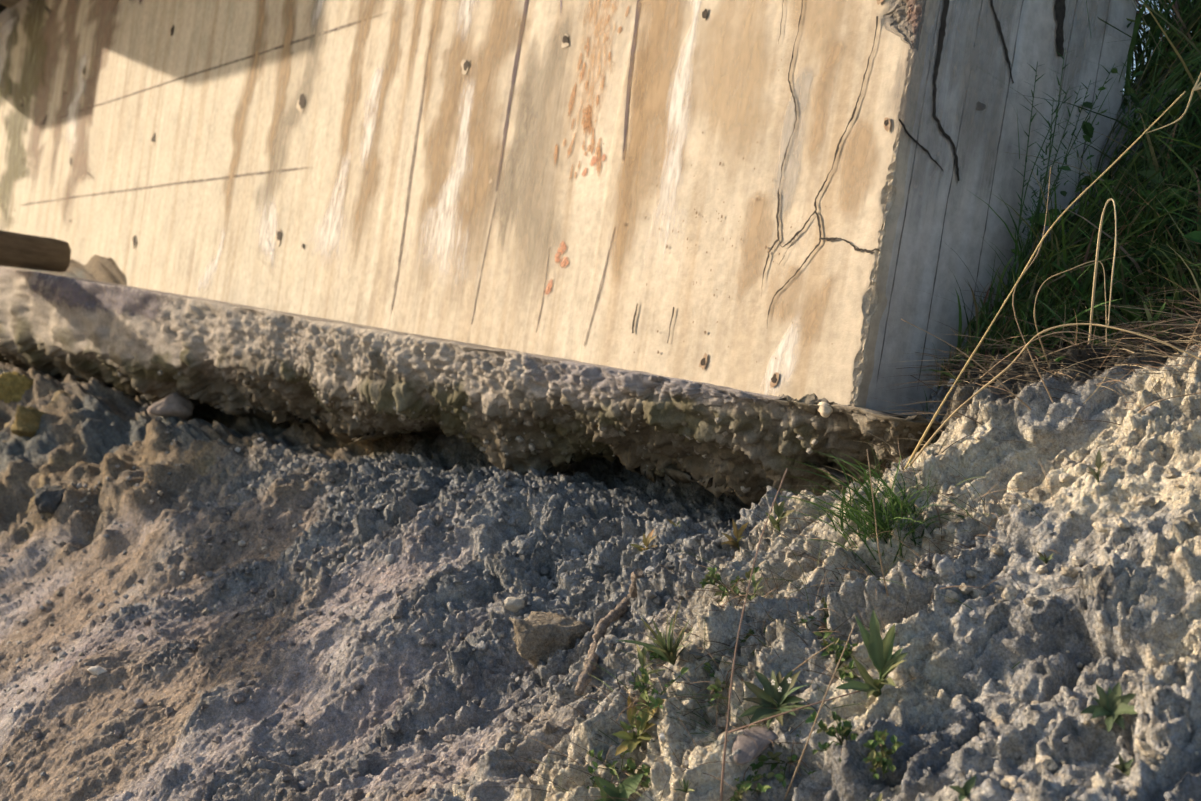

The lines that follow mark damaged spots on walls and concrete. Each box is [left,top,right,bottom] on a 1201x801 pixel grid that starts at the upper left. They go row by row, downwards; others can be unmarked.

leakage [0,0,118,223]
leakage [226,0,267,211]
leakage [319,0,567,270]
rust [554,0,629,178]
leakage [615,0,700,269]
crack [761,0,879,321]
spalling [849,0,927,433]
crack [899,0,960,181]
crack [990,0,1014,84]
crack [1055,0,1066,56]
spalling [207,357,663,471]
spalling [752,434,818,458]